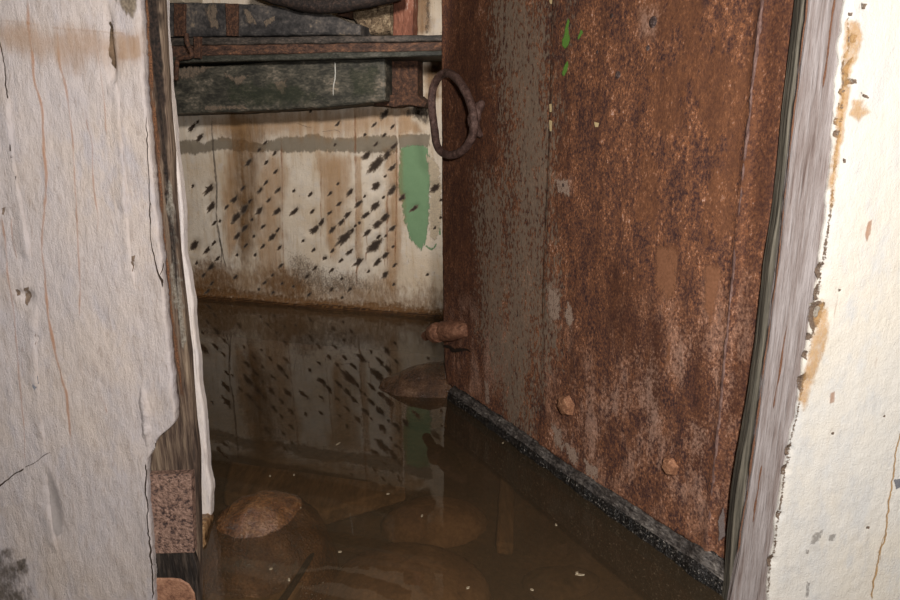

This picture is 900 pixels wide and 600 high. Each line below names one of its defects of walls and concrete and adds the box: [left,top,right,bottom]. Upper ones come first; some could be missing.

mould [407,108,428,123]
spalling [833,3,869,173]
crack [146,119,164,287]
water stain [195,263,444,356]
spalling [802,188,834,360]
spalling [767,372,806,595]
crack [871,436,900,597]